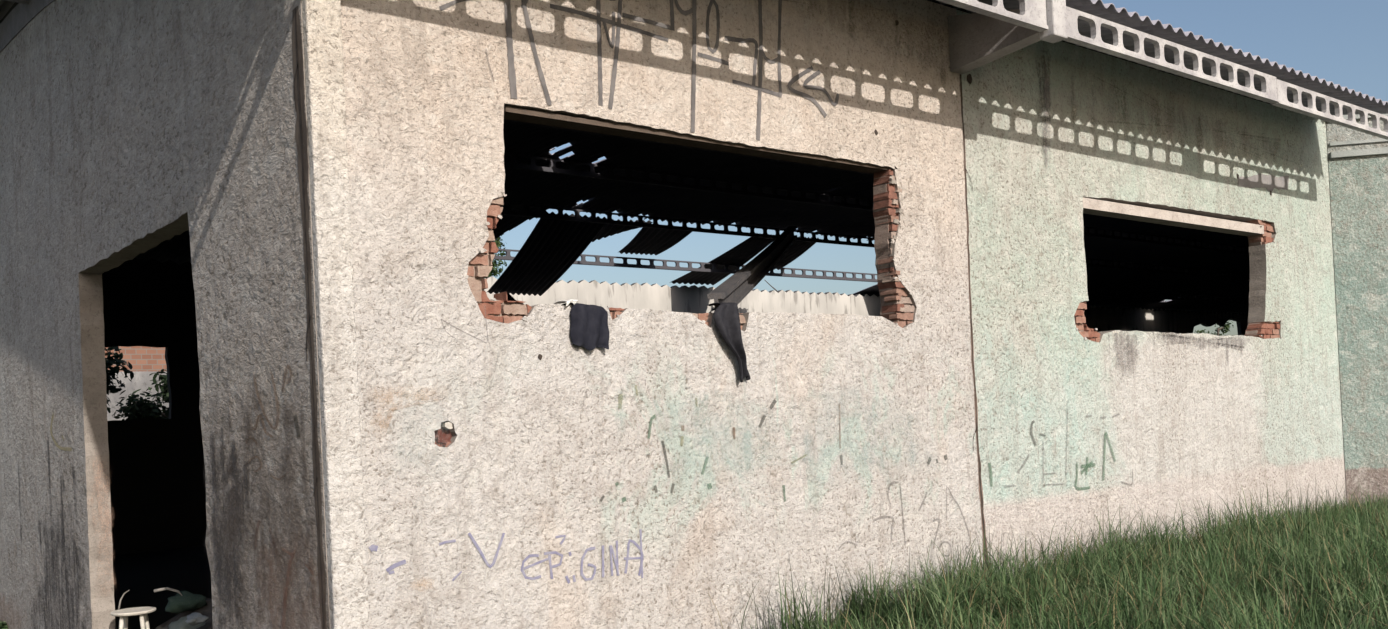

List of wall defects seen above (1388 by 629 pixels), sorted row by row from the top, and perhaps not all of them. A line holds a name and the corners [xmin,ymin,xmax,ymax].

flaking render [1244,219,1275,246]
flaking render [465,194,532,323]
flaking render [873,169,915,328]
flaking render [607,306,624,319]
flaking render [692,311,714,326]
flaking render [1074,301,1101,342]
flaking render [1245,320,1282,339]
spalling [434,422,453,447]
water stain [18,441,75,572]